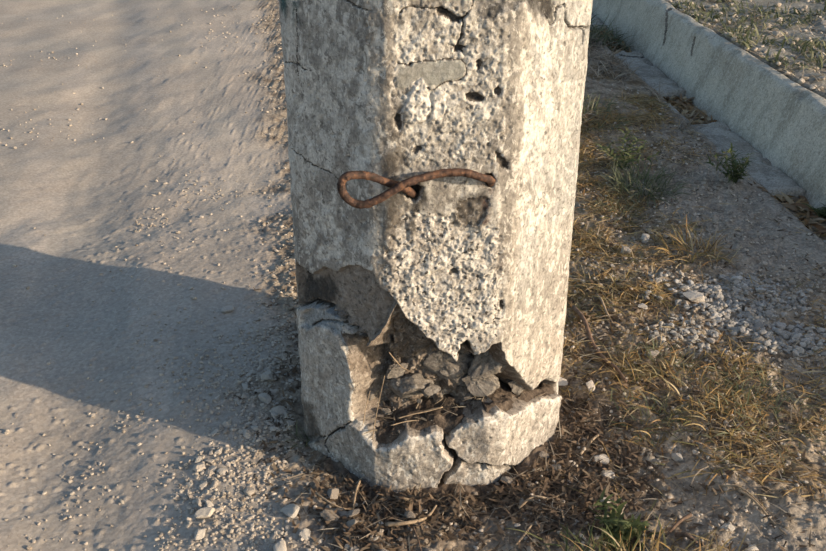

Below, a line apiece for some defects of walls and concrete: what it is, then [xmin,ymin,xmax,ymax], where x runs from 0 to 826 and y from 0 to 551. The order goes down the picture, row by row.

crack [285,10,311,76]
crack [397,0,473,90]
crack [544,3,588,44]
crack [662,8,672,46]
crack [291,148,339,180]
spalling [295,184,561,449]
crack [325,421,353,460]
crack [442,433,504,479]